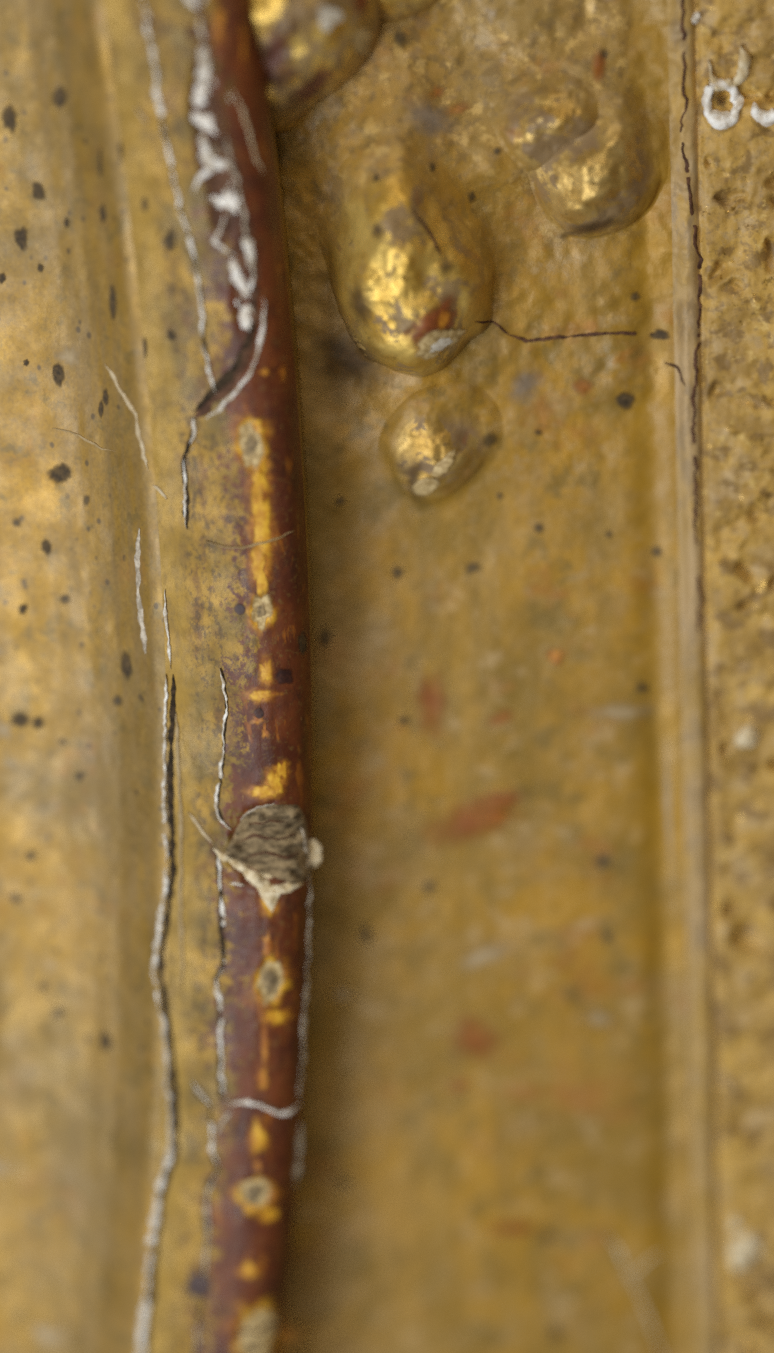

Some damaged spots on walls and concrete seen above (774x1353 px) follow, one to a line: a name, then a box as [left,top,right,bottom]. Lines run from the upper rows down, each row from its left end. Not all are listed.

crack [142,0,266,530]
crack [475,0,703,544]
crack [696,576,704,634]
crack [134,528,313,1353]